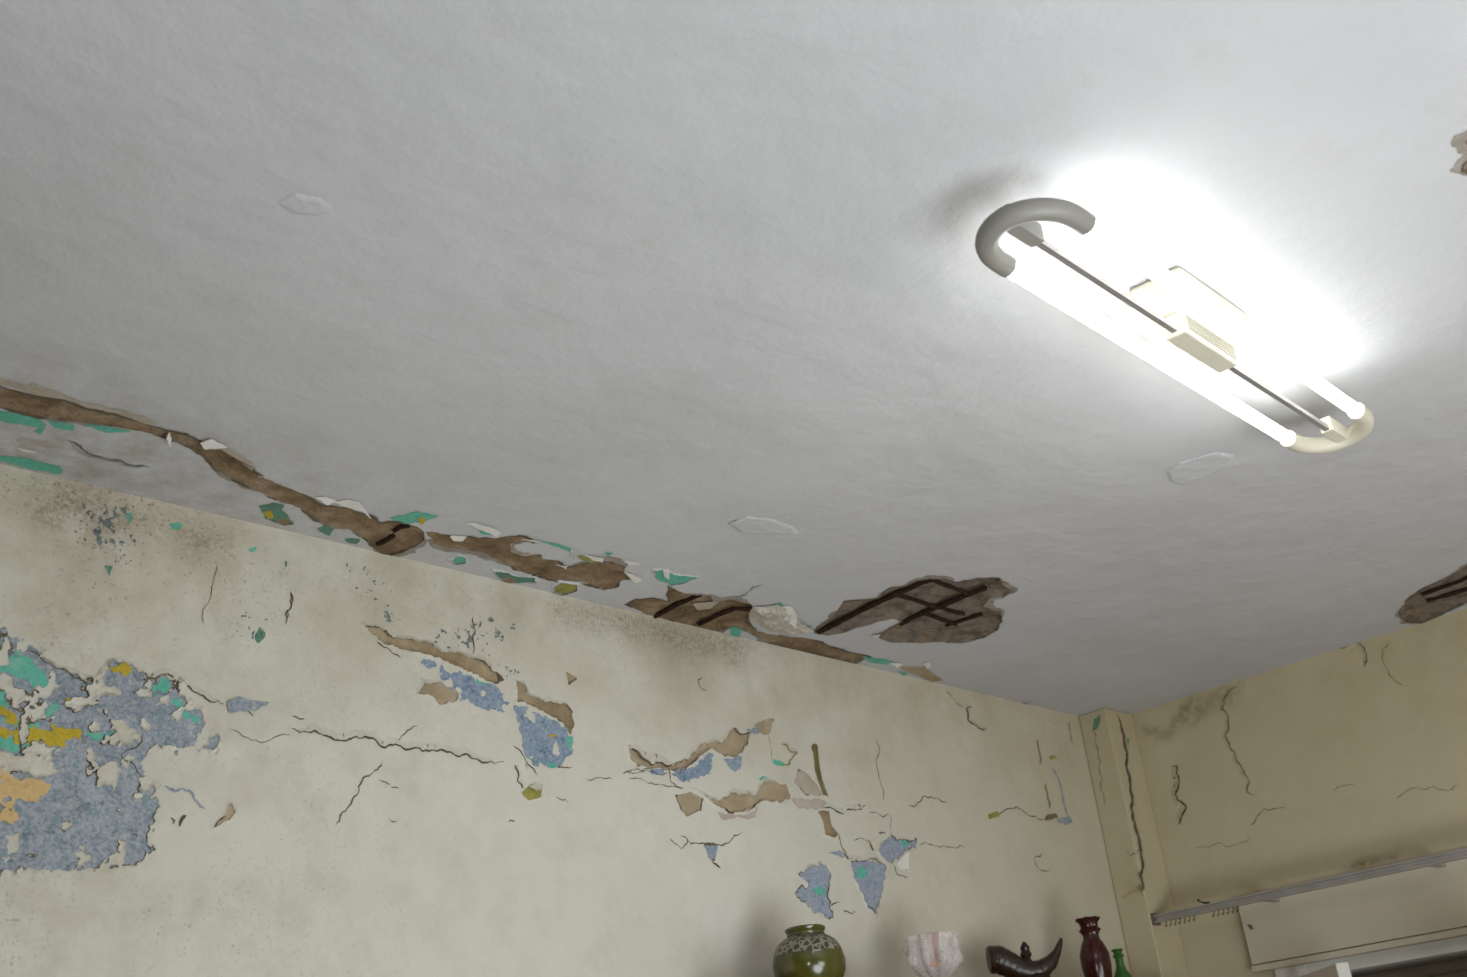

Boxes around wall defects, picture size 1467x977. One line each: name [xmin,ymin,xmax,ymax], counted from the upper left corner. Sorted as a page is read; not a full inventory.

spalling [1450,131,1467,176]
flaking render [0,379,1018,802]
spalling [1395,564,1467,624]
peeling [0,627,269,885]
crack [230,716,504,824]
crack [556,768,650,802]
peeling [623,718,917,920]
crack [1069,715,1147,897]
crack [1171,686,1285,848]